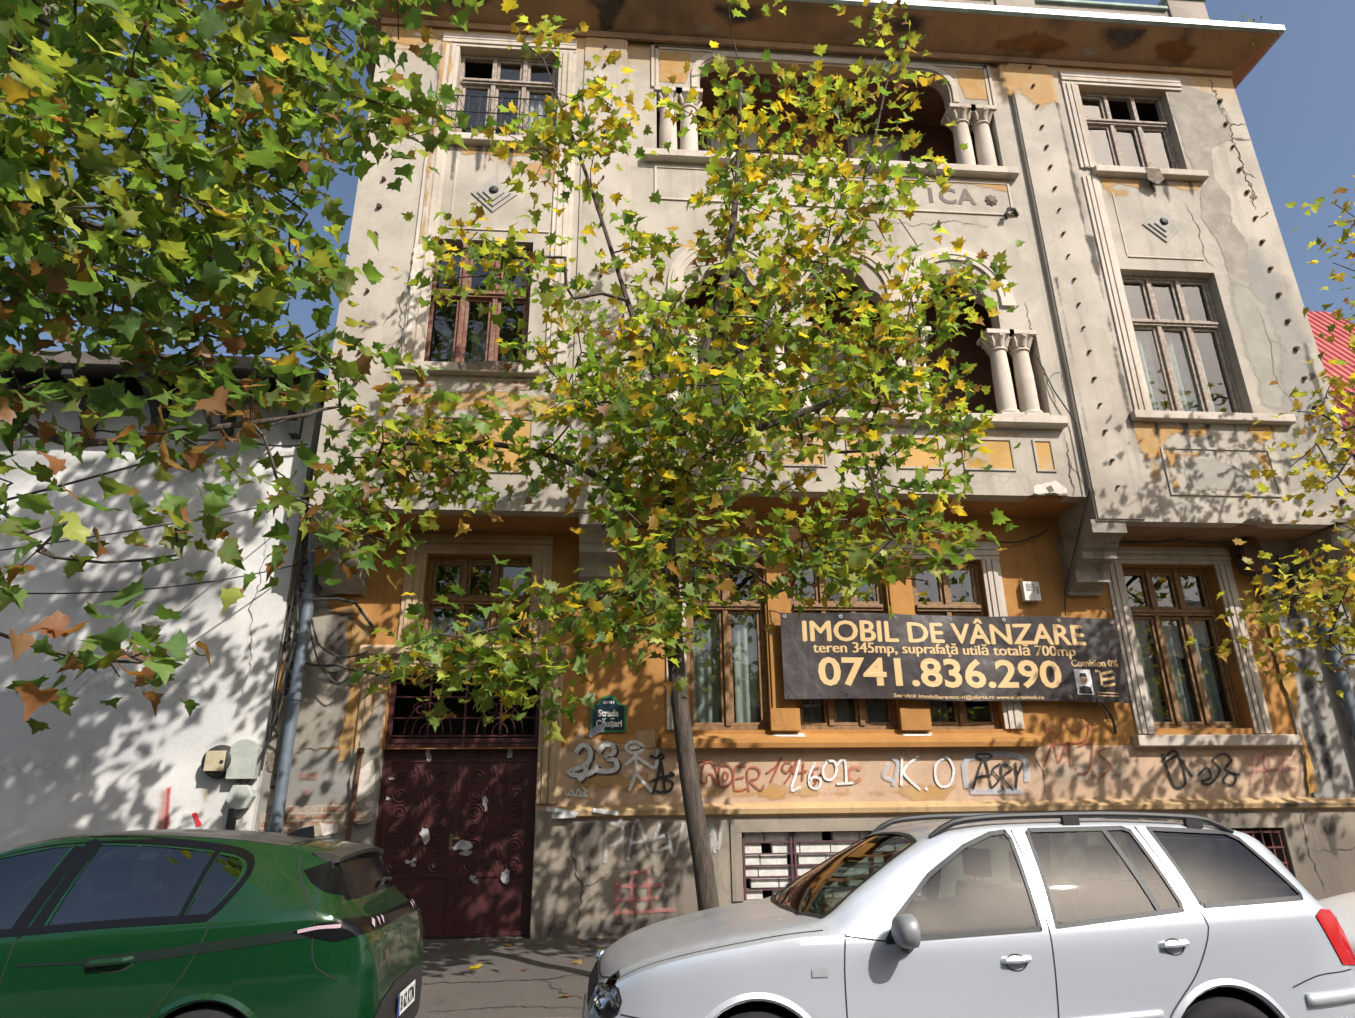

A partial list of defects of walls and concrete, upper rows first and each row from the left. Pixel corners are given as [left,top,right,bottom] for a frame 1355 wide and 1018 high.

leakage [590,0,625,31]
leakage [1106,28,1145,47]
peeling [957,70,988,100]
peeling [999,65,1057,106]
crack [1209,78,1258,209]
peeling [1133,422,1207,488]
peeling [1249,427,1276,470]
crack [236,515,308,789]
flaking render [258,607,384,837]